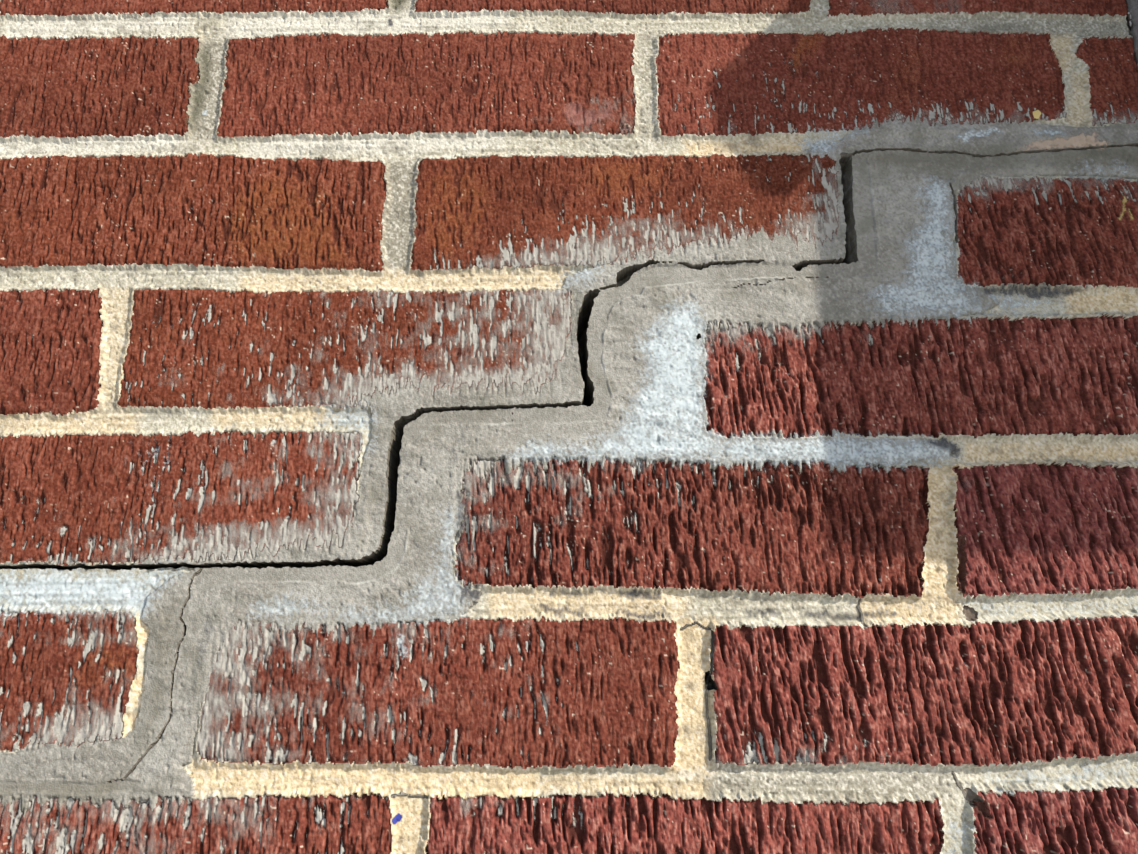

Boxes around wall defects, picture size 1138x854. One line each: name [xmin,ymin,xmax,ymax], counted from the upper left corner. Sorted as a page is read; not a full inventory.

damp [514,302,960,470]
damp [319,407,373,436]
crack [0,143,1138,784]
damp [350,495,480,677]
damp [0,568,176,746]
damp [197,601,471,765]
damp [504,634,544,670]
damp [496,666,562,735]
damp [0,795,219,854]
damp [233,794,277,844]
damp [308,797,326,827]
crack [951,771,974,807]